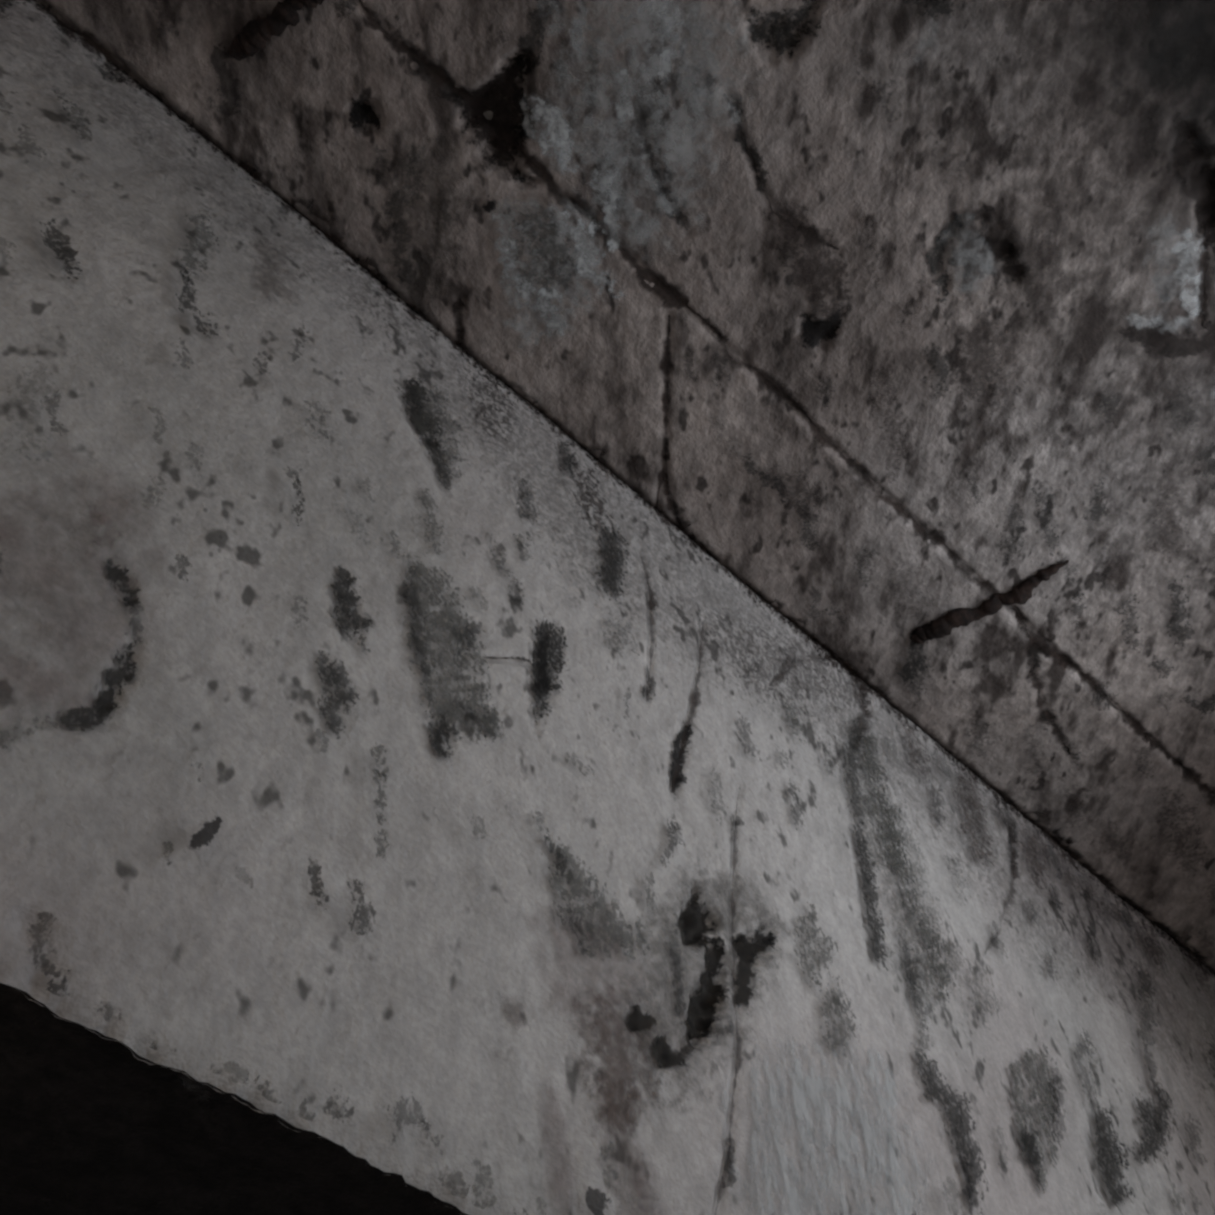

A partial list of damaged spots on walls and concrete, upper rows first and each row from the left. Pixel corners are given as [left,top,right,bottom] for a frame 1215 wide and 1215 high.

crack [41,3,465,350]
water stain [492,0,737,344]
water stain [162,101,1215,1003]
crack [359,0,1215,975]
spalling [625,892,777,1068]
water stain [959,1154,979,1215]
water stain [1009,1044,1061,1186]